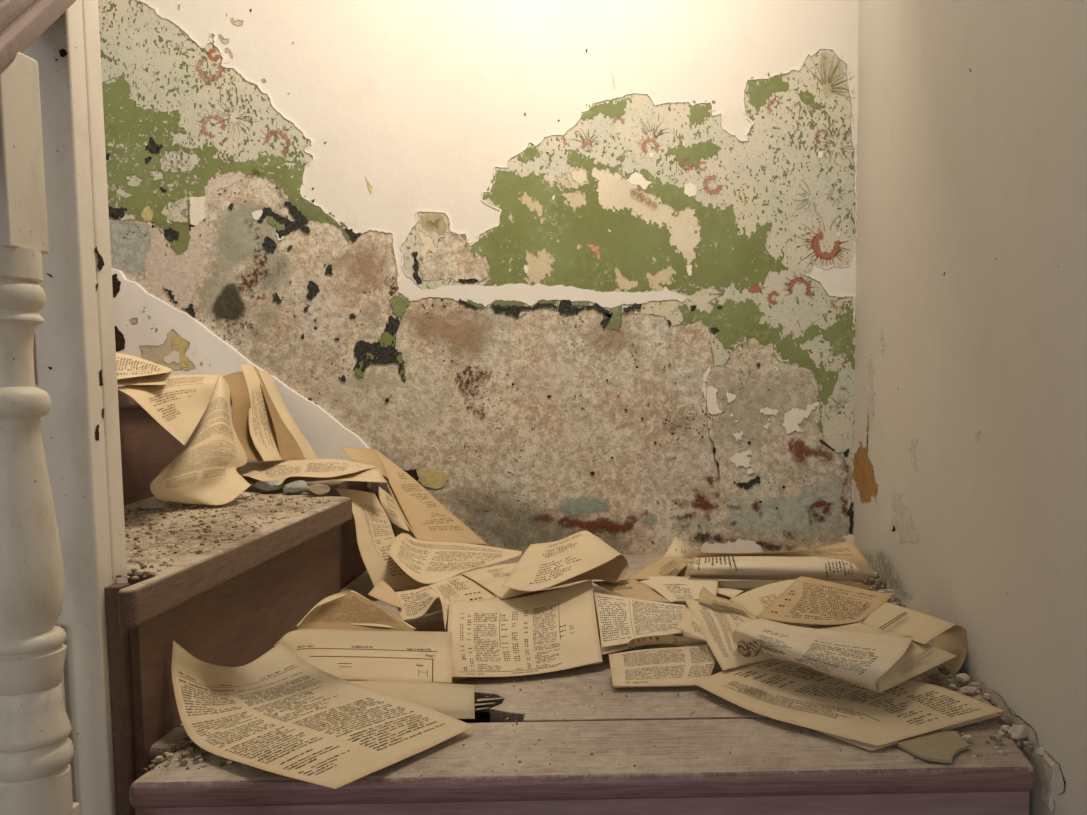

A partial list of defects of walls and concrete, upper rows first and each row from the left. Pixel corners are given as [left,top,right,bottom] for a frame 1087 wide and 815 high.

flaking render [95,0,878,555]